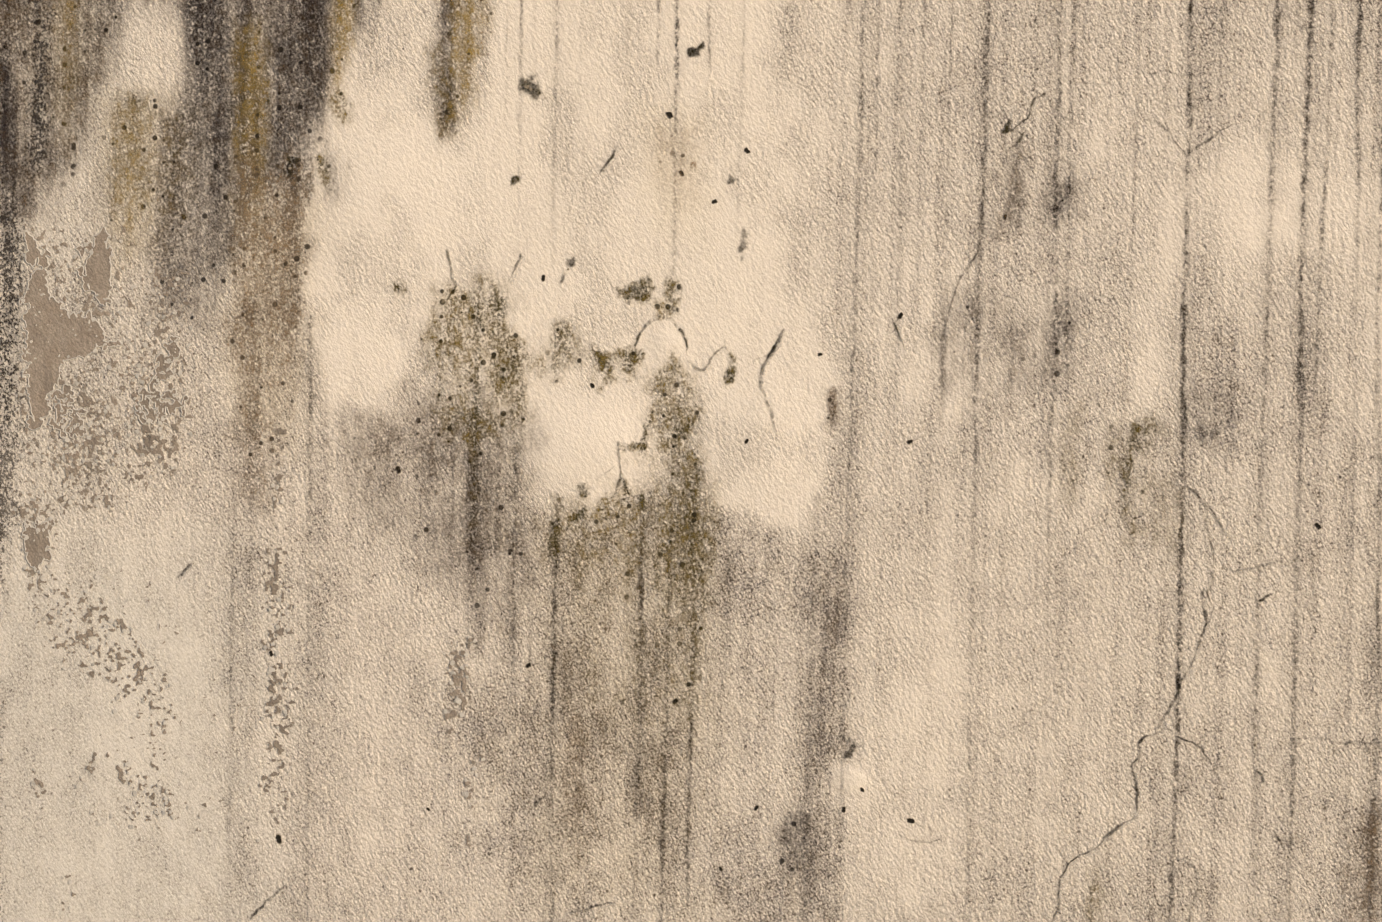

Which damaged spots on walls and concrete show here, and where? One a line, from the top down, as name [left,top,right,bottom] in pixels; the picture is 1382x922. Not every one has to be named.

leakage [157,0,364,320]
peeling [1,211,242,841]
leakage [416,418,449,487]
leakage [428,285,513,396]
leakage [466,483,525,608]
leakage [549,505,560,574]
leakage [1176,475,1185,682]
leakage [1180,290,1205,458]
crack [1187,485,1244,571]
crack [1054,591,1212,918]